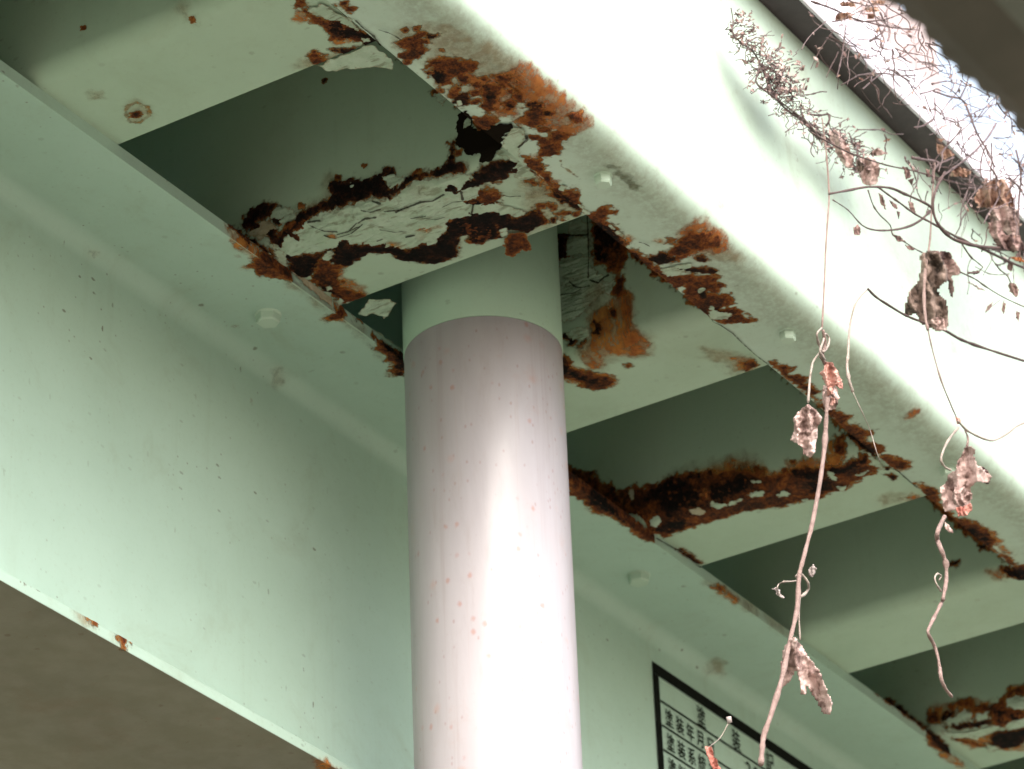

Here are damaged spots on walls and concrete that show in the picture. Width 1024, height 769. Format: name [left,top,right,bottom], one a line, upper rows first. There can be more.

rust [125,102,152,123]
rust [306,50,329,65]
rust [394,25,594,158]
rust [227,224,404,377]
peeling [241,128,546,278]
peeling [557,216,609,323]
rust [527,202,769,391]
rust [568,433,878,568]
rust [709,583,739,604]
rust [875,693,964,767]